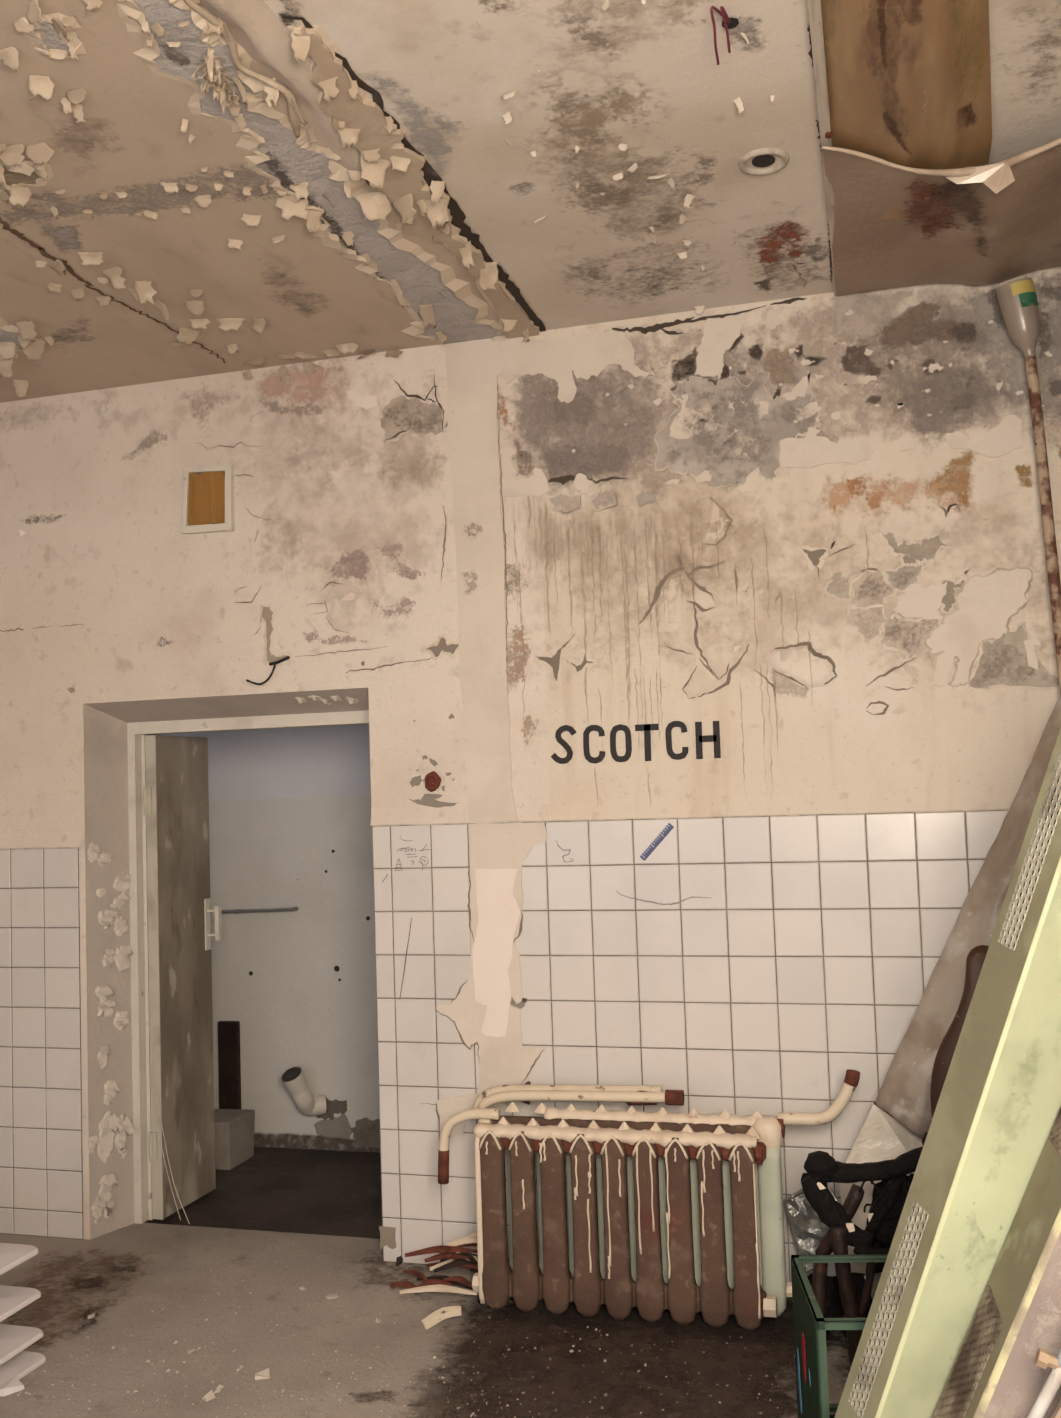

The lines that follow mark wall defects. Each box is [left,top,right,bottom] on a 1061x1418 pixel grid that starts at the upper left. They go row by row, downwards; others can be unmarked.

peeling [225,23,539,344]
leakage [554,92,688,233]
peeling [600,143,705,271]
crack [0,217,226,363]
peeling [35,252,403,380]
spalling [638,348,872,508]
corrosion [830,452,973,512]
leakage [506,629,528,682]
crack [639,497,917,715]
peeling [799,531,1060,691]
spalling [436,822,547,1136]
spalling [314,1095,380,1148]